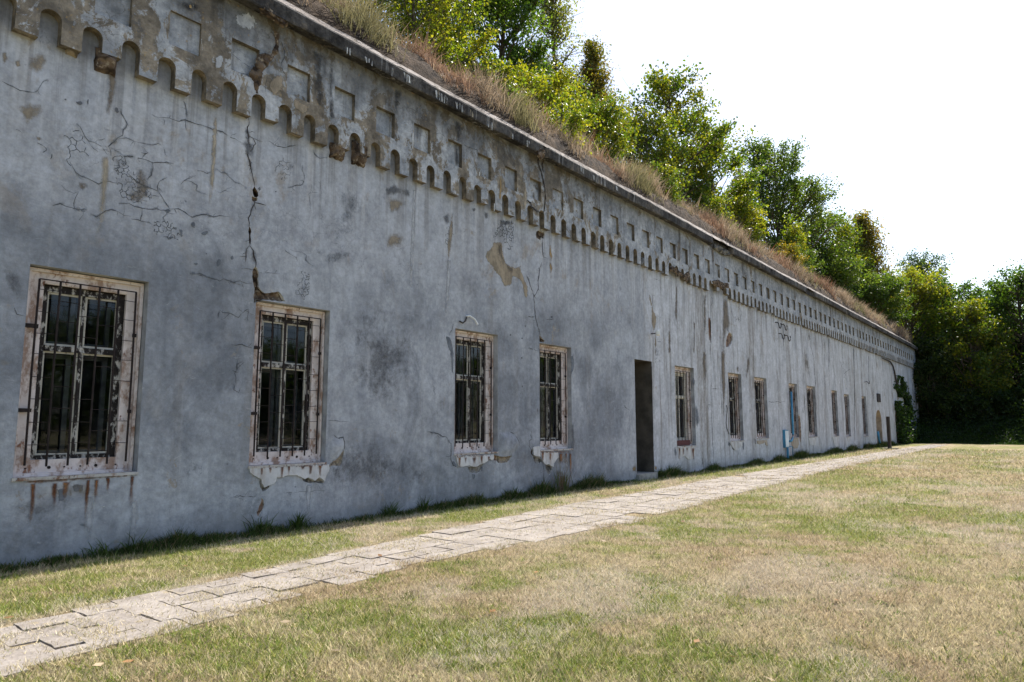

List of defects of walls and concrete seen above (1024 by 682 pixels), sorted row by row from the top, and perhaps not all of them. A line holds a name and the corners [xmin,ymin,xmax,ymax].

peeling [236,13,257,30]
spalling [94,47,117,78]
flaking render [249,30,284,95]
spalling [329,140,368,168]
crack [16,101,325,393]
peeling [485,242,528,297]
corrosion [29,475,134,508]
flaking render [249,450,344,516]
flaking render [453,454,512,479]
flaking render [531,446,559,474]